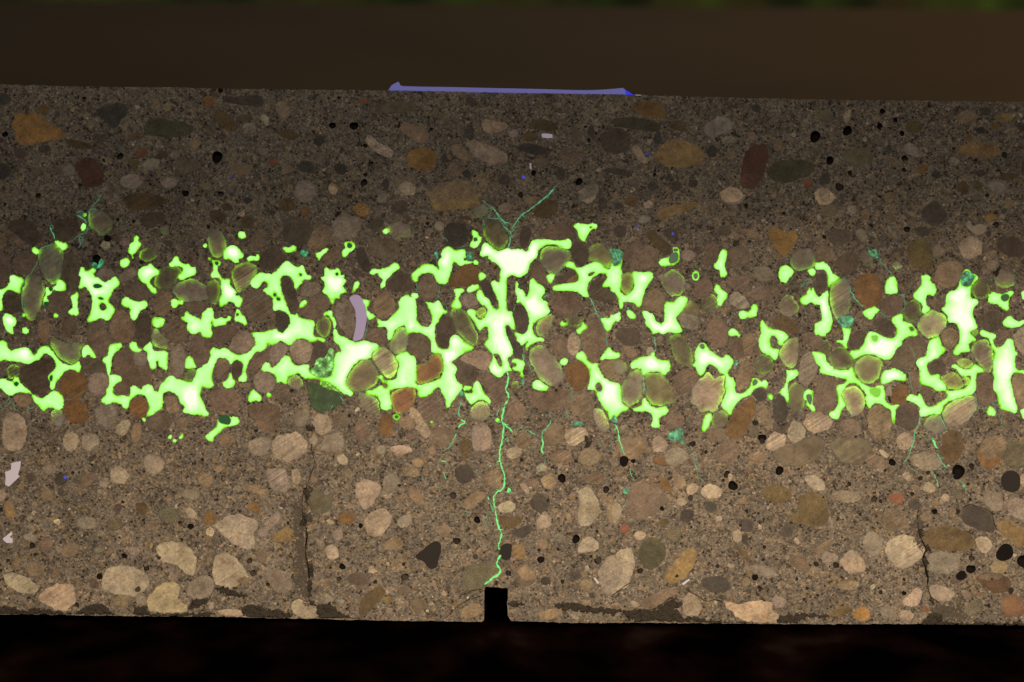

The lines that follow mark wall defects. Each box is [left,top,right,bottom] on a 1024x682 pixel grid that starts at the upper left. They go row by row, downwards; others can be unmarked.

crack [442,187,555,248]
crack [302,445,315,579]
crack [443,345,573,619]
crack [917,513,939,603]